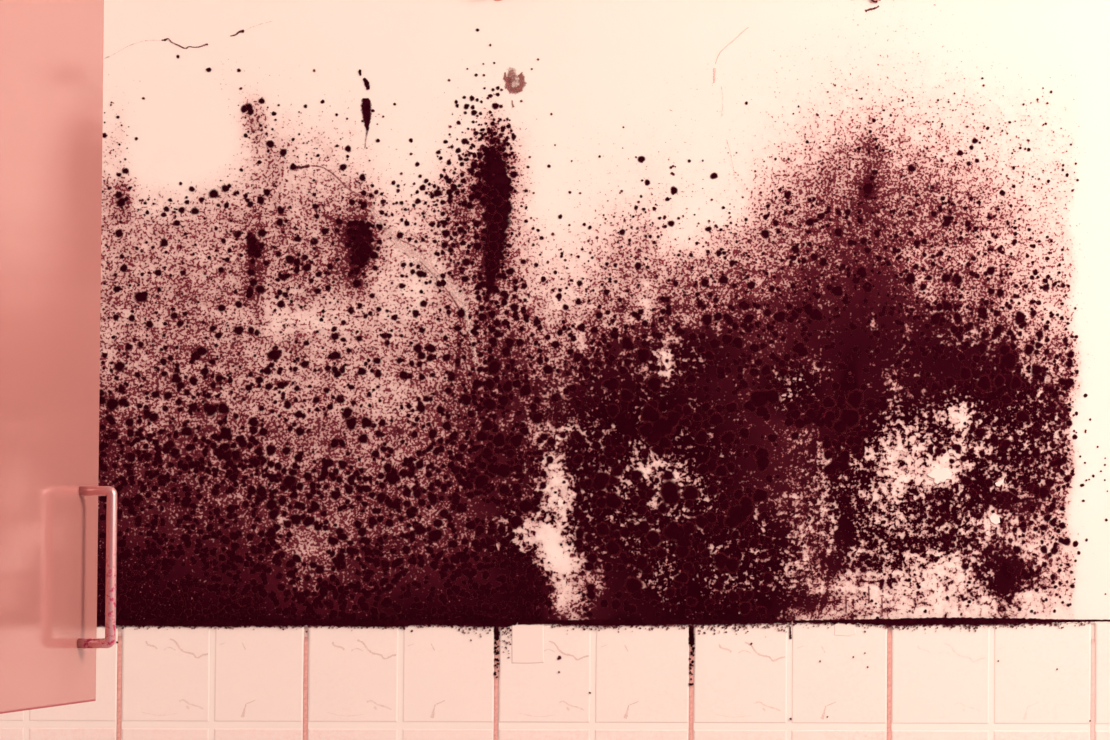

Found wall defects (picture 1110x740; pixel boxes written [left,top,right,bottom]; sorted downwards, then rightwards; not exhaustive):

crack [162,38,206,49]
damp [97,53,1108,639]